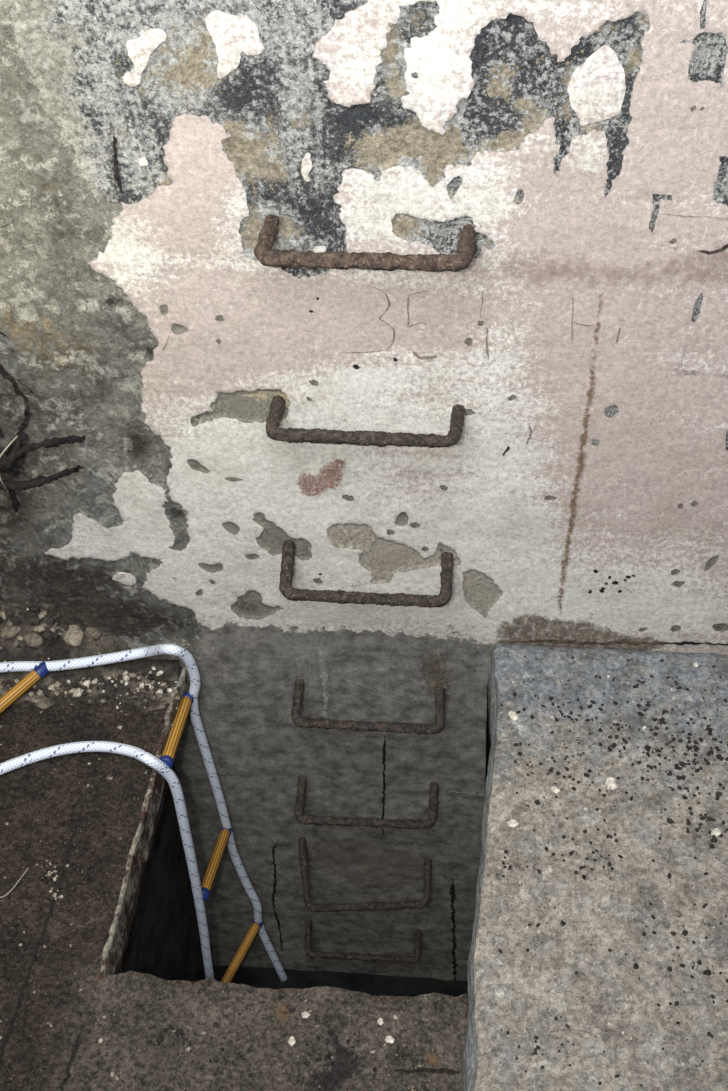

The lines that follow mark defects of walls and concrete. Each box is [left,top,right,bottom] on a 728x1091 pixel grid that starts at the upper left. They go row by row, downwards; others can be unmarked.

flaking render [649,193,673,235]
flaking render [0,0,650,672]
crack [0,364,33,454]